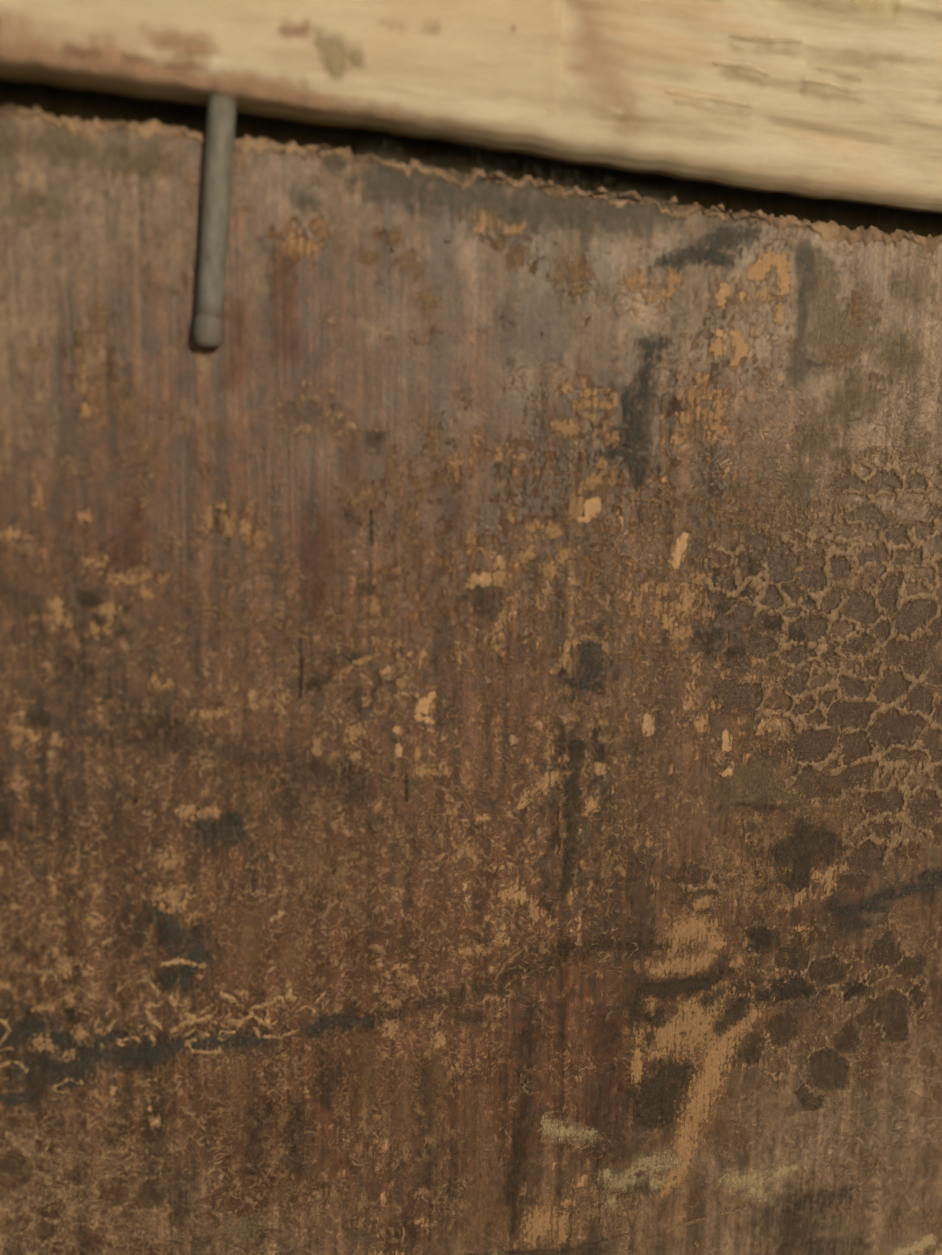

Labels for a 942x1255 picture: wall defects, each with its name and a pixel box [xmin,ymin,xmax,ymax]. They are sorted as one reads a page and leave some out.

peeling [472,204,527,237]
damp [656,220,760,272]
peeling [714,250,792,326]
peeling [550,379,618,439]
damp [606,334,668,487]
peeling [670,328,751,448]
peeling [462,427,623,654]
peeling [626,806,860,1083]
damp [0,1012,269,1174]